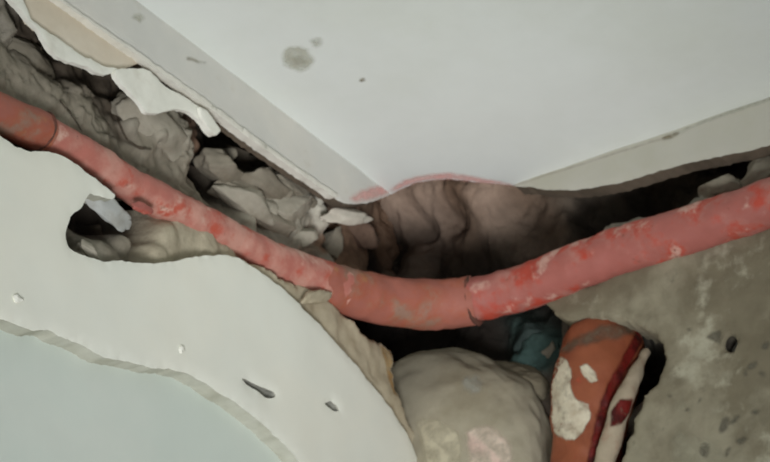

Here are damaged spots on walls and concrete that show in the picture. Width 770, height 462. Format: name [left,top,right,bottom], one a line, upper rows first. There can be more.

leakage [286,48,312,68]
flaking render [0,0,770,279]
hole [242,379,274,398]
peeling [365,229,770,462]